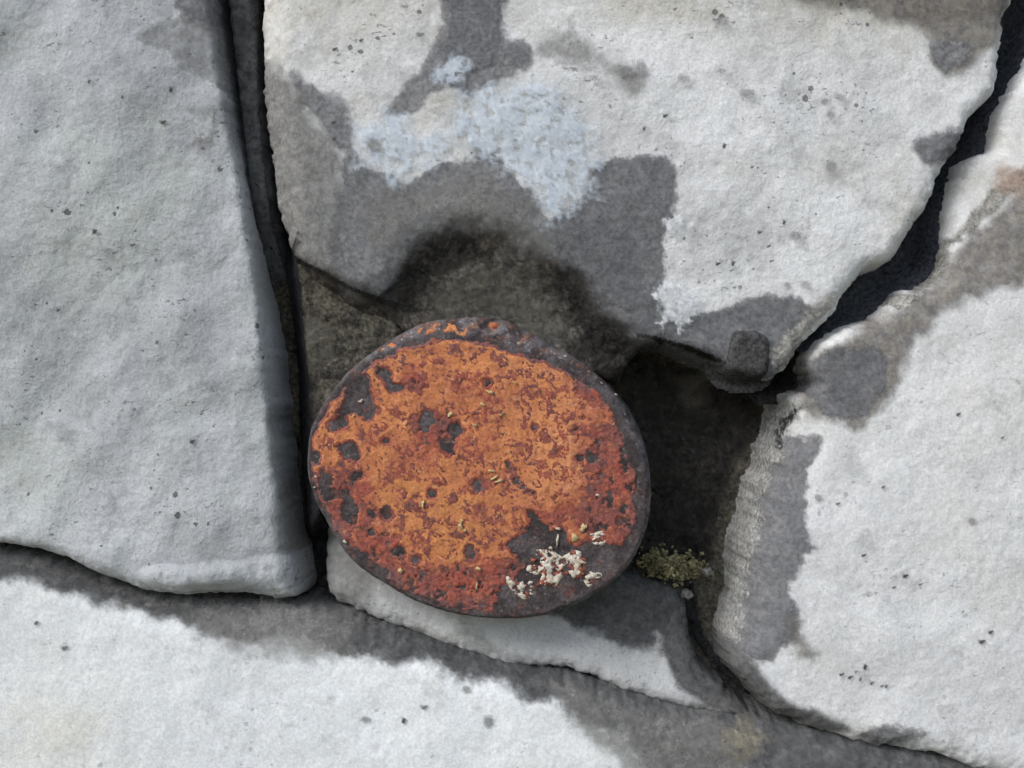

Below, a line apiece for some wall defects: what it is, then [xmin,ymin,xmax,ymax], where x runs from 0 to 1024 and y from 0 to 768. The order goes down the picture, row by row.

water stain [289,0,848,731]
water stain [789,193,1024,430]
water stain [0,474,383,653]
water stain [556,686,747,768]